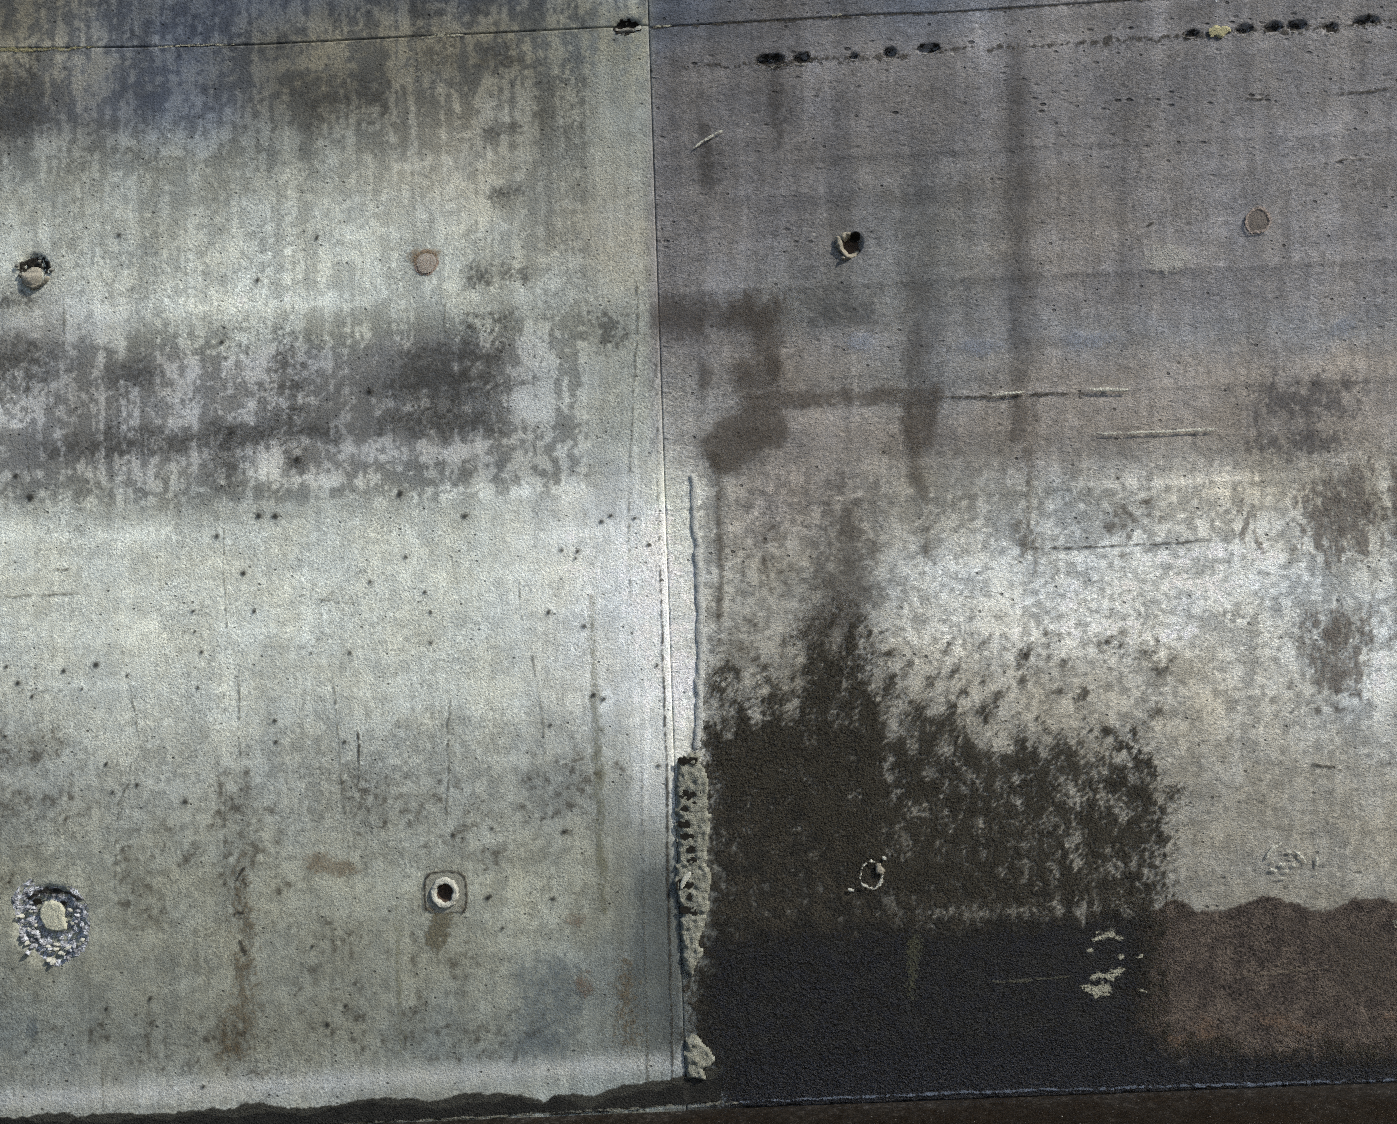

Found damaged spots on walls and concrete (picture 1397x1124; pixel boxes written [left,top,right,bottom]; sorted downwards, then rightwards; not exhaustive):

leakage [704,387,941,470]
leakage [0,596,1397,1124]